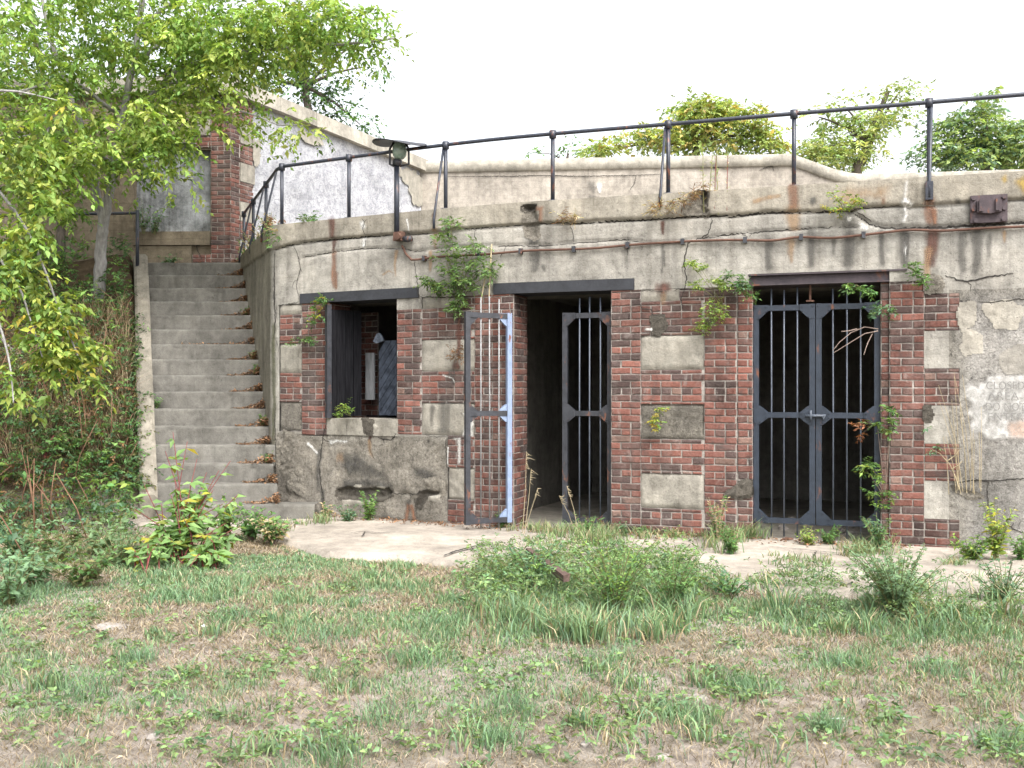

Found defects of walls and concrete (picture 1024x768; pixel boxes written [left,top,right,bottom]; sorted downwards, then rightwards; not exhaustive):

rust [789,185,797,229]
crack [464,205,1024,316]
rust [926,200,938,274]
peeling [956,299,1024,357]
peeling [999,344,1024,375]
crack [317,418,447,500]
spalling [335,484,394,506]
spalling [415,489,441,510]